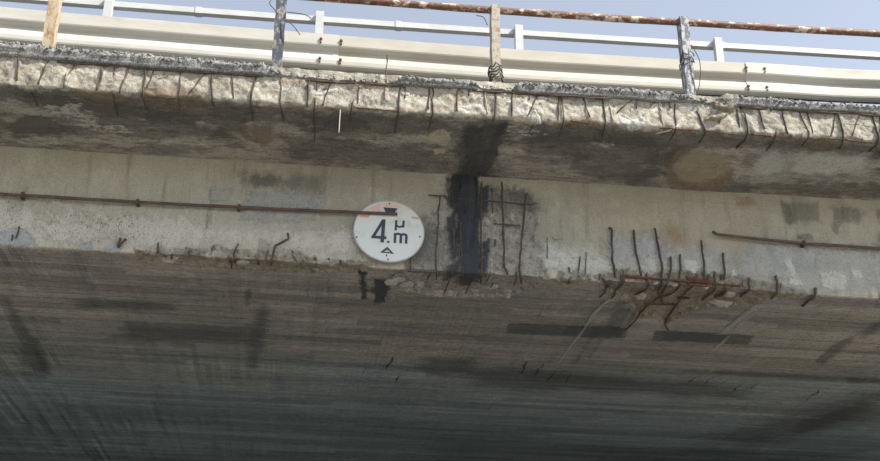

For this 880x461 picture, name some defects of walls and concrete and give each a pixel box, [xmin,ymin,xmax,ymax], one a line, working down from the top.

spalling [0,41,880,152]
peeling [0,191,374,274]
water stain [427,100,550,286]
spalling [384,182,880,331]
water stain [752,150,871,180]